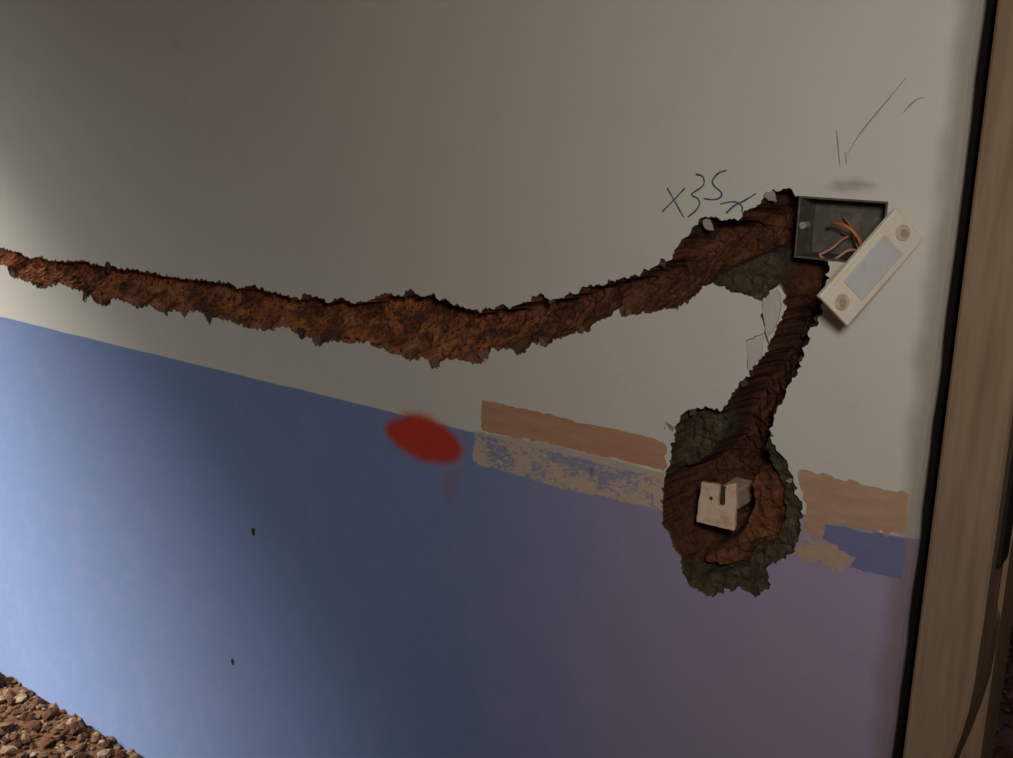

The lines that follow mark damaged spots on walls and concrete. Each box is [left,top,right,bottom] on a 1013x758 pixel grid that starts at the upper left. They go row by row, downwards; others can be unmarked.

crack [746,289,782,370]
spalling [472,400,909,598]